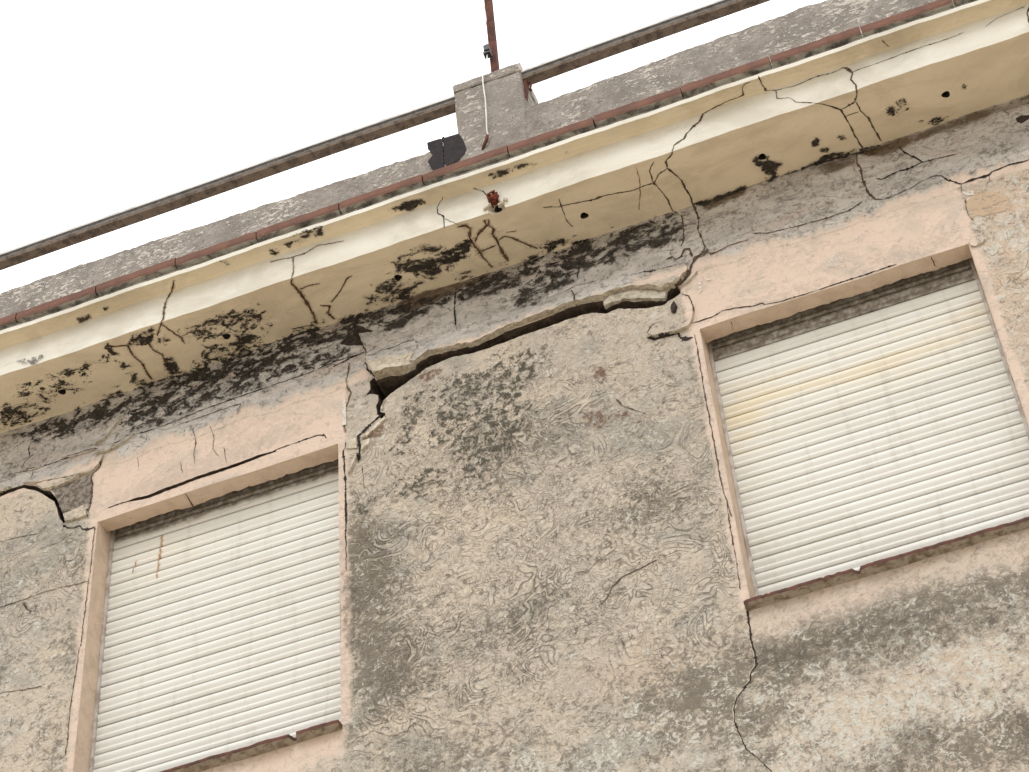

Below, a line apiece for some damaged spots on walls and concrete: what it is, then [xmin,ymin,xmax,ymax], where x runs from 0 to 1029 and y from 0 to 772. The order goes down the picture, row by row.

water stain [0,99,1009,442]
crack [108,32,1029,589]
spalling [603,271,709,314]
crack [0,437,121,755]
crack [598,559,658,606]
crack [732,608,772,772]